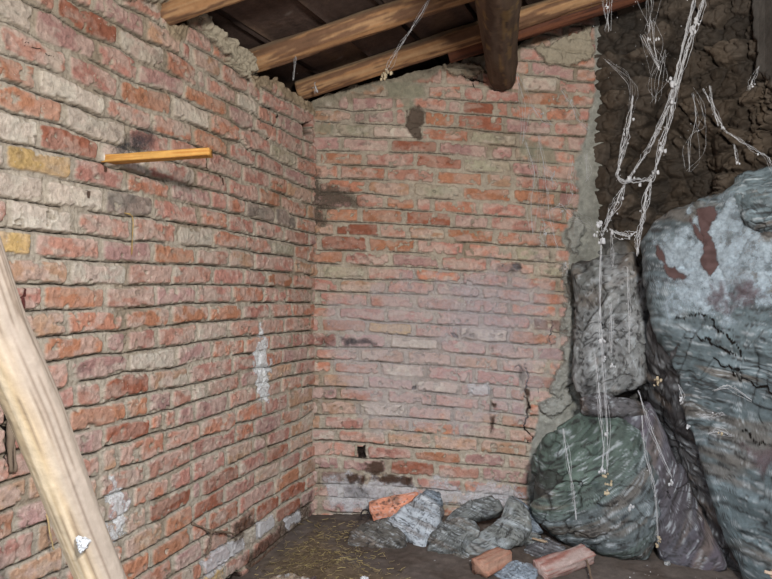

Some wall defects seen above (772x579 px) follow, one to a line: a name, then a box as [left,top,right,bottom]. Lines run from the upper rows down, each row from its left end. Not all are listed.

leakage [251,323,272,403]
crack [0,412,8,460]
crack [515,365,533,445]
leakage [105,476,131,541]
leakage [327,461,416,512]
leakage [429,477,519,506]